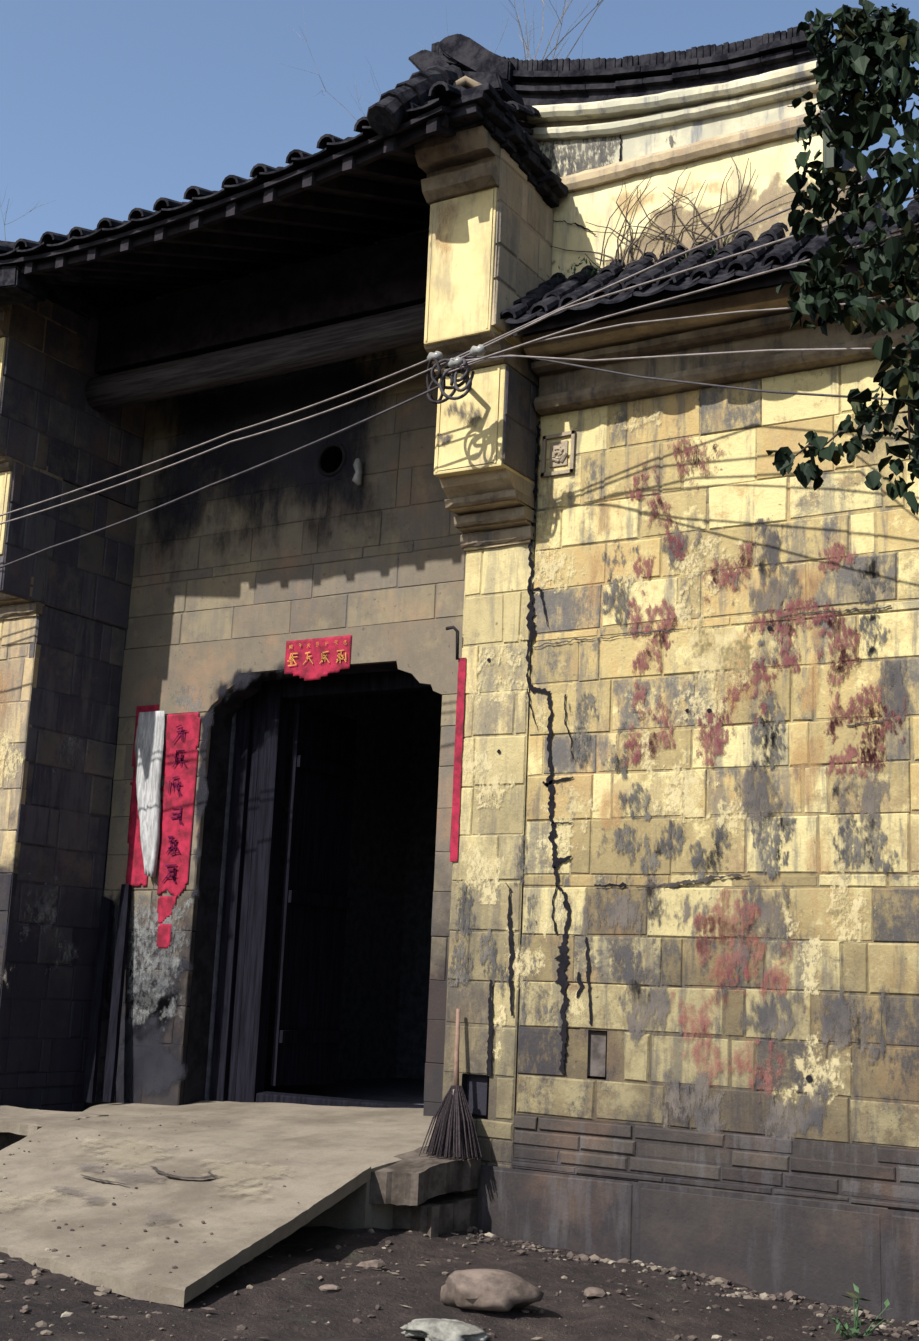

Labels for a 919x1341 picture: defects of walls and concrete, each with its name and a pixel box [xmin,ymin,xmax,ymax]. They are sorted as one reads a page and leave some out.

damp [601,539,640,628]
damp [730,517,802,615]
damp [851,551,909,722]
peeling [0,733,23,787]
peeling [127,896,192,1025]
crack [486,883,515,1076]
damp [447,834,568,1033]
crack [525,421,750,1073]
damp [566,692,730,1044]
damp [717,690,797,1001]
peeling [678,889,876,1092]
damp [832,766,900,878]